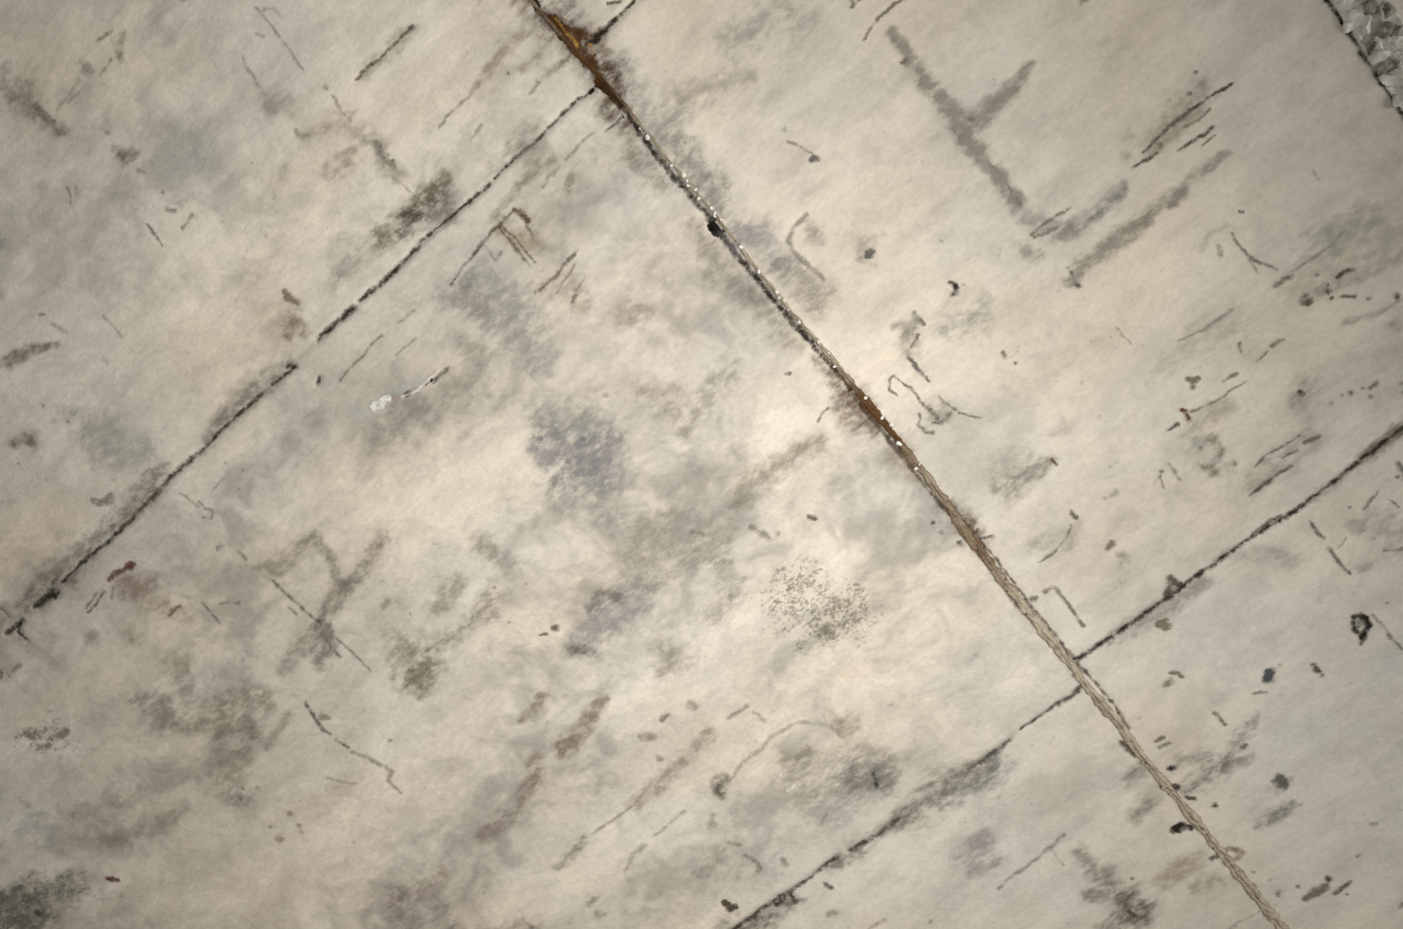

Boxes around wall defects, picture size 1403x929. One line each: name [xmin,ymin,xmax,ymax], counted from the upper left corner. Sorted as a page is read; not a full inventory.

corrosion [536,12,619,86]
damp [0,885,50,929]